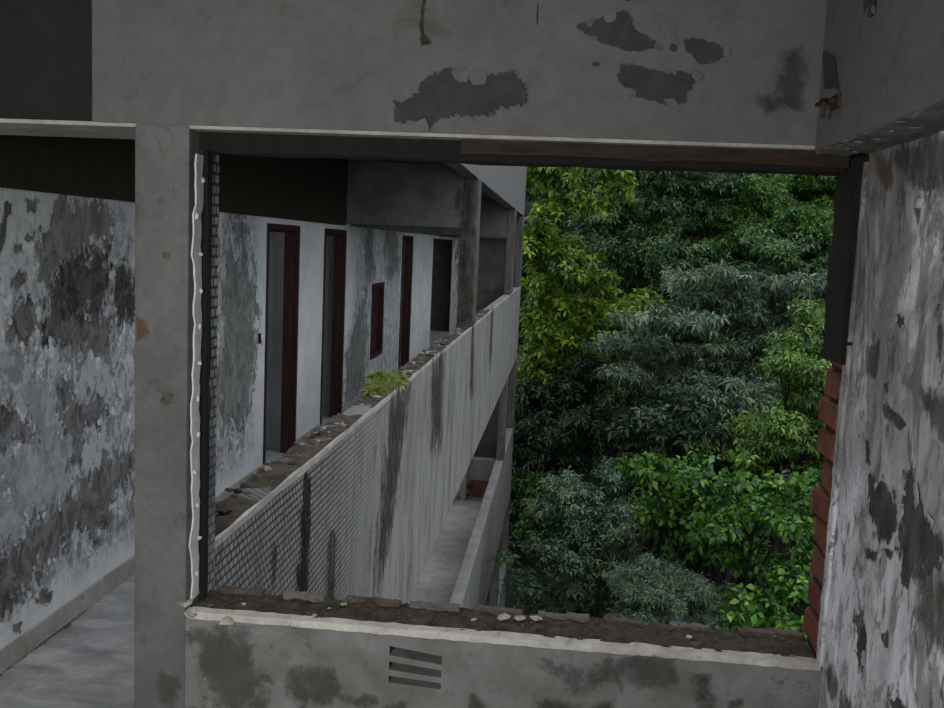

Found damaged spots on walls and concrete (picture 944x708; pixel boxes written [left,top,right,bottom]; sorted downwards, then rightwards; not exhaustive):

peeling [393,67,528,132]
peeling [576,0,730,109]
peeling [25,196,39,214]
peeling [31,194,115,290]
peeling [0,293,135,634]
leakage [374,374,410,584]
leakage [429,342,445,453]
leakage [866,339,879,381]
leakage [920,387,944,444]
leakage [297,471,311,592]
leakage [914,570,944,657]
leakage [821,665,851,708]